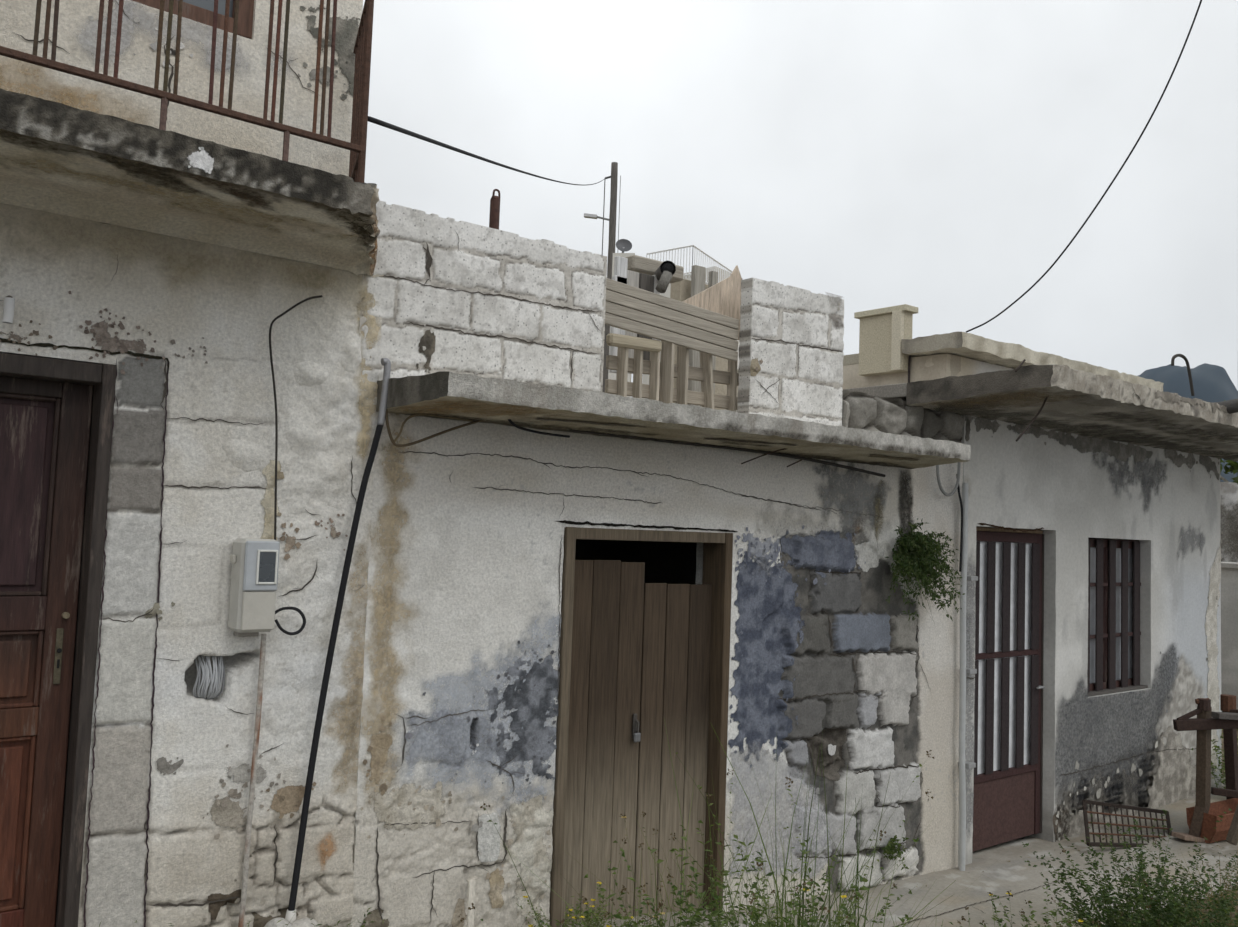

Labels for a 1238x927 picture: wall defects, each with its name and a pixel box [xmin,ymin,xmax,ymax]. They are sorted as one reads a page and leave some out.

damp [0,130,282,227]
damp [305,201,377,246]
peeling [0,320,58,356]
peeling [79,308,208,375]
damp [328,432,412,791]
peeling [361,640,560,927]
damp [407,617,561,802]
crack [400,451,931,732]
peeling [728,525,885,768]
spalling [806,728,847,810]